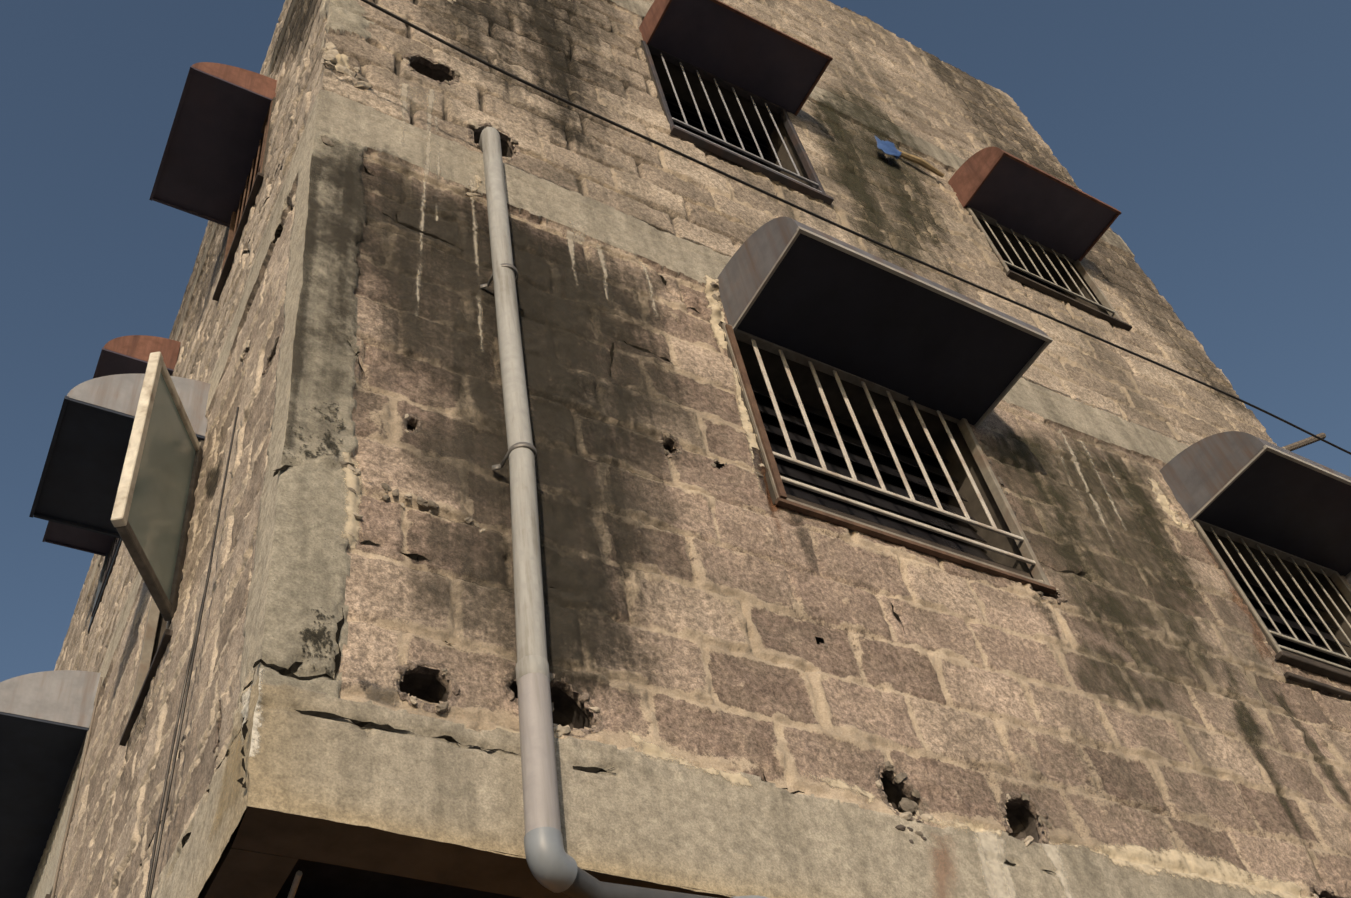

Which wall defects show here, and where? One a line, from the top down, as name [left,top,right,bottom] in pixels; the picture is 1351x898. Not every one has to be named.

spalling [401,53,460,85]
leakage [283,84,509,468]
leakage [510,222,656,689]
leakage [299,607,340,681]
leakage [987,430,1300,834]
crack [206,608,518,793]
spalling [390,660,462,714]
spalling [550,673,604,737]
crack [140,807,191,866]
crack [573,766,616,774]
spalling [874,761,934,844]
spalling [999,792,1052,847]